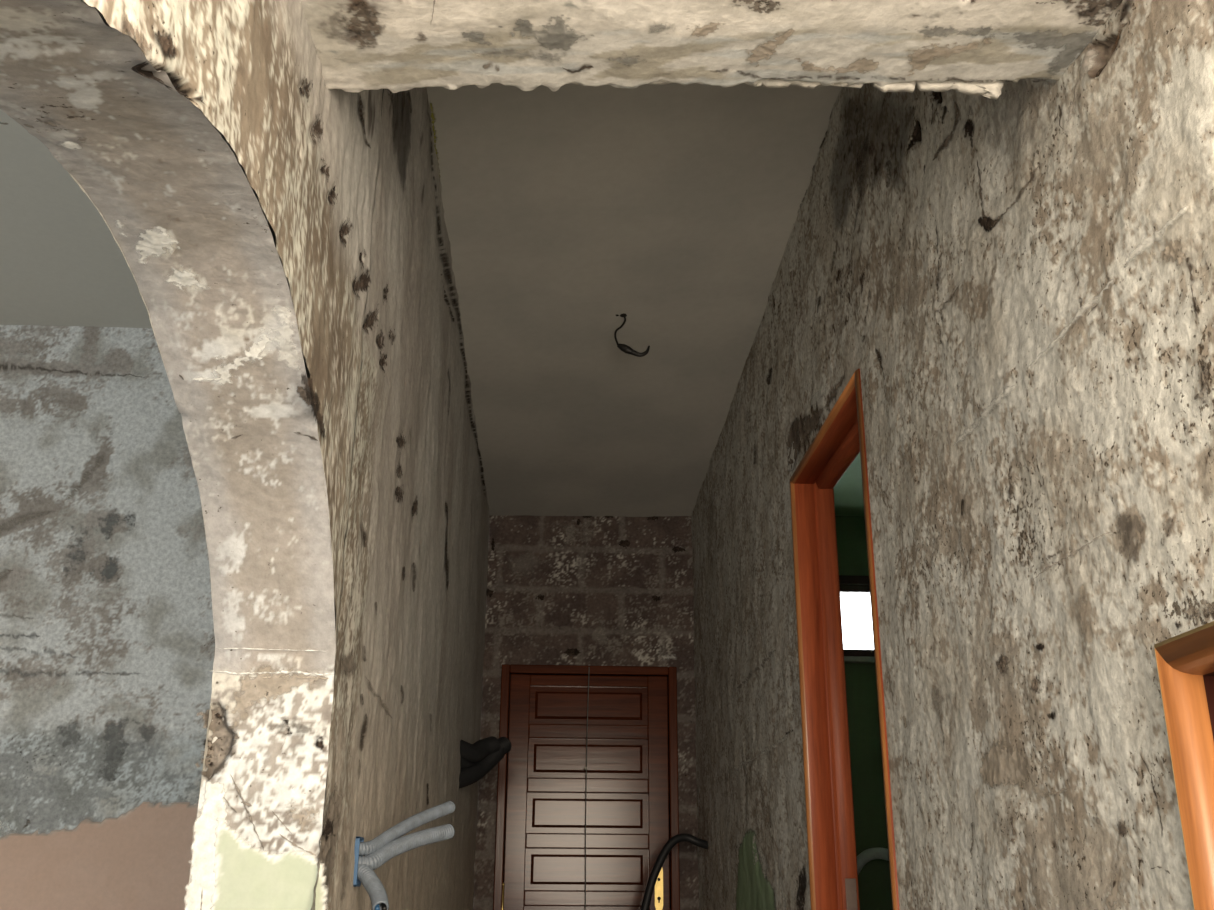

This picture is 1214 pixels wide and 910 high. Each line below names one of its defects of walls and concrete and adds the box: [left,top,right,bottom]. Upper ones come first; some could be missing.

peeling [0,651,356,910]
peeling [736,829,806,910]